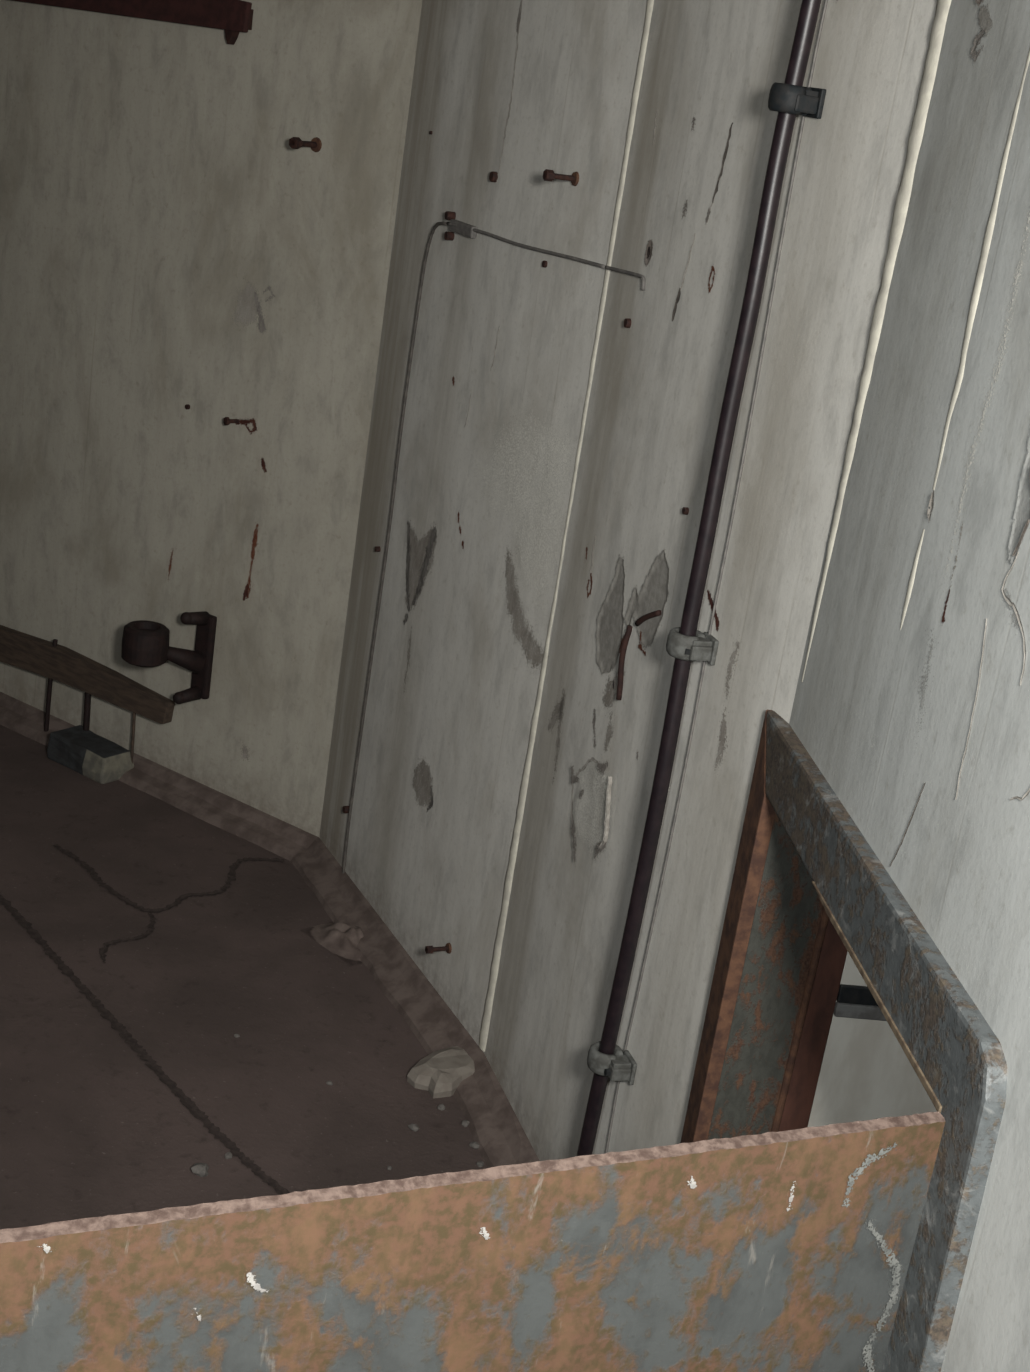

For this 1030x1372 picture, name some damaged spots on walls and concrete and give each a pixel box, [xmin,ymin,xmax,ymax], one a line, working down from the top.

spalling [970,0,993,66]
rust [243,523,259,601]
spalling [403,520,438,693]
spalling [595,549,670,709]
spalling [1002,435,1030,686]
spalling [411,756,434,812]
crack [53,844,284,963]
rust [812,881,942,1113]